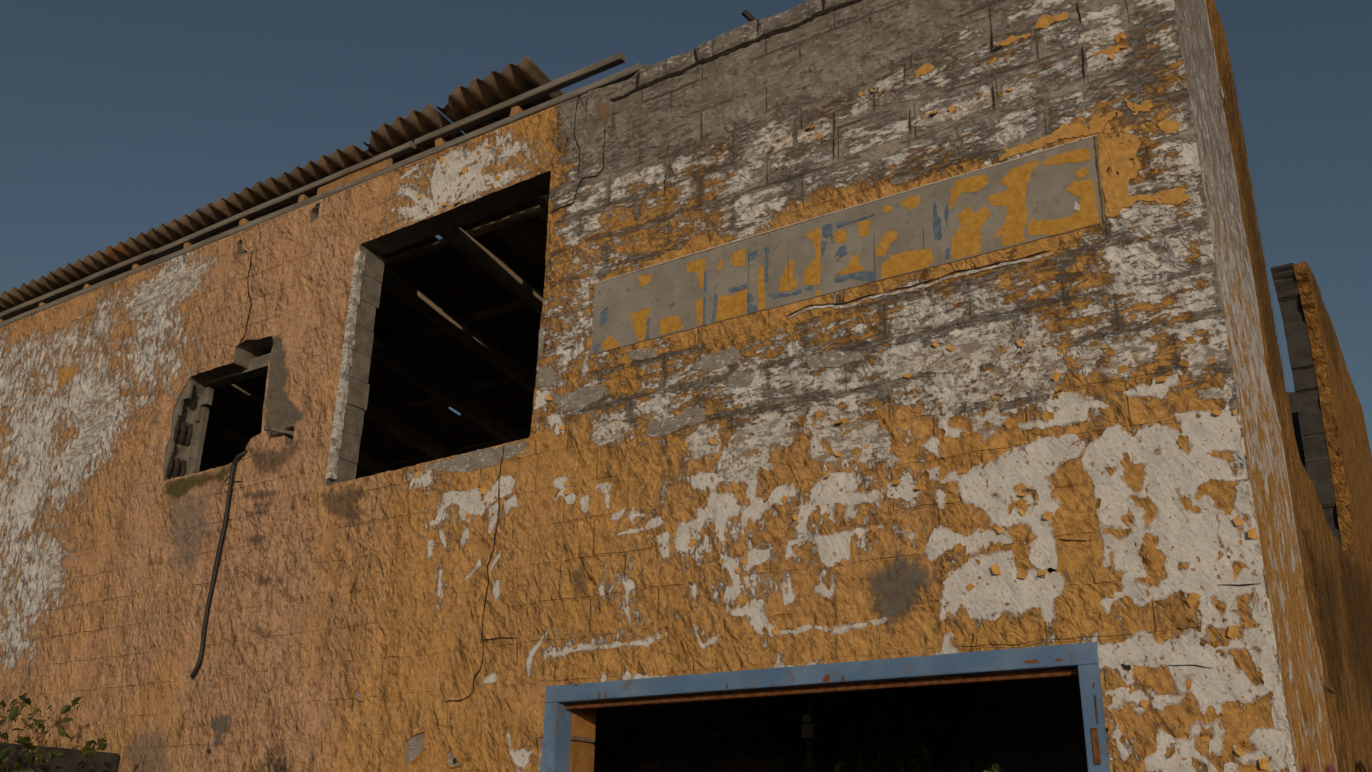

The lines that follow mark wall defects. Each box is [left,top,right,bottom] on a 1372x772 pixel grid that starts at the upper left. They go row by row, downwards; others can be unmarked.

peeling [397,143,521,222]
peeling [740,122,832,162]
peeling [844,68,904,101]
peeling [911,82,1034,127]
crack [239,253,252,343]
crack [786,250,1052,318]
peeling [534,328,609,436]
peeling [408,441,527,603]
crack [444,446,518,702]
peeling [526,579,668,677]
water stain [868,551,930,622]
peeling [553,326,1290,772]